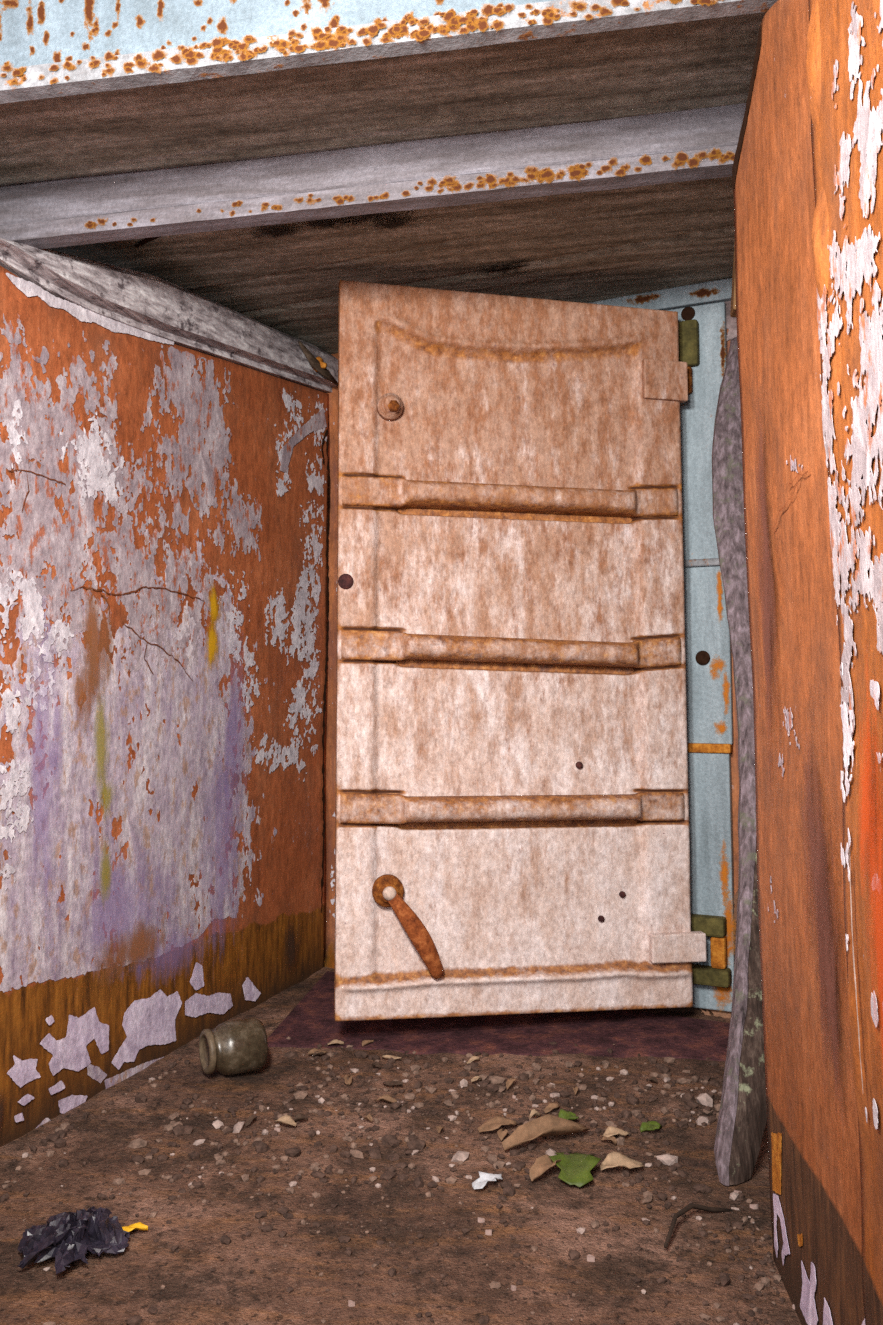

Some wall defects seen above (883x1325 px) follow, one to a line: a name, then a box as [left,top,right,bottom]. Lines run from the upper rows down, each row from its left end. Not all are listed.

rust [0,0,640,85]
rust [85,218,155,229]
rust [221,148,735,216]
peeling [817,0,883,803]
peeling [0,273,337,993]
peeling [841,828,851,882]
peeling [7,962,261,1129]
peeling [865,1098,878,1130]
peeling [771,1132,833,1325]